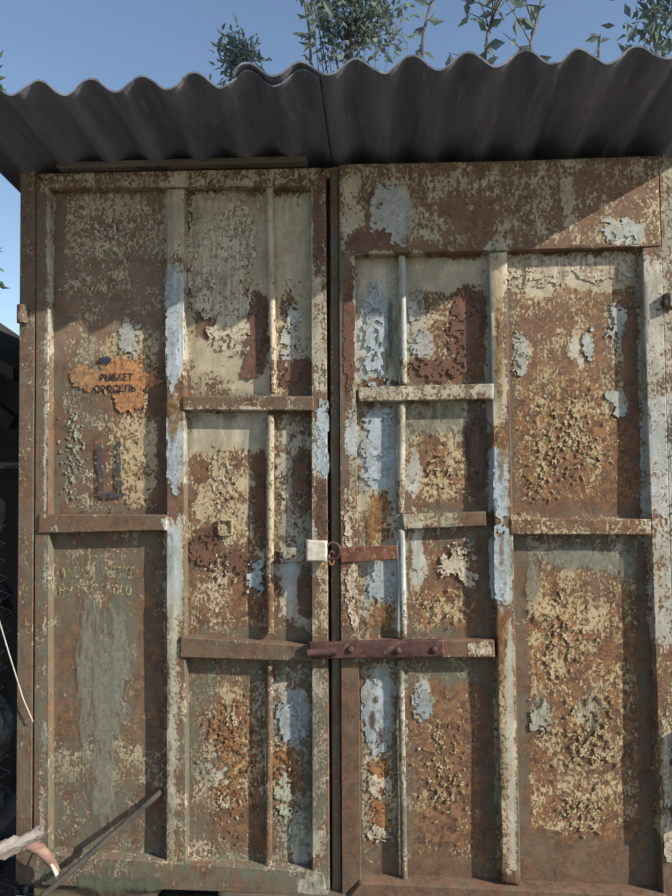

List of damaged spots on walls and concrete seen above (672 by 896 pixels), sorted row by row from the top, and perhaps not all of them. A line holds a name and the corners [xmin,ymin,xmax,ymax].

peeling [370,181,412,247]
peeling [165,191,262,496]
peeling [279,303,307,369]
peeling [361,278,392,387]
peeling [407,298,433,358]
corrosion [168,392,179,440]
peeling [315,398,329,480]
corrosion [467,401,508,506]
peeling [204,547,265,596]
corrosion [203,693,256,820]
corrosion [370,697,384,742]
corrosion [364,753,397,834]